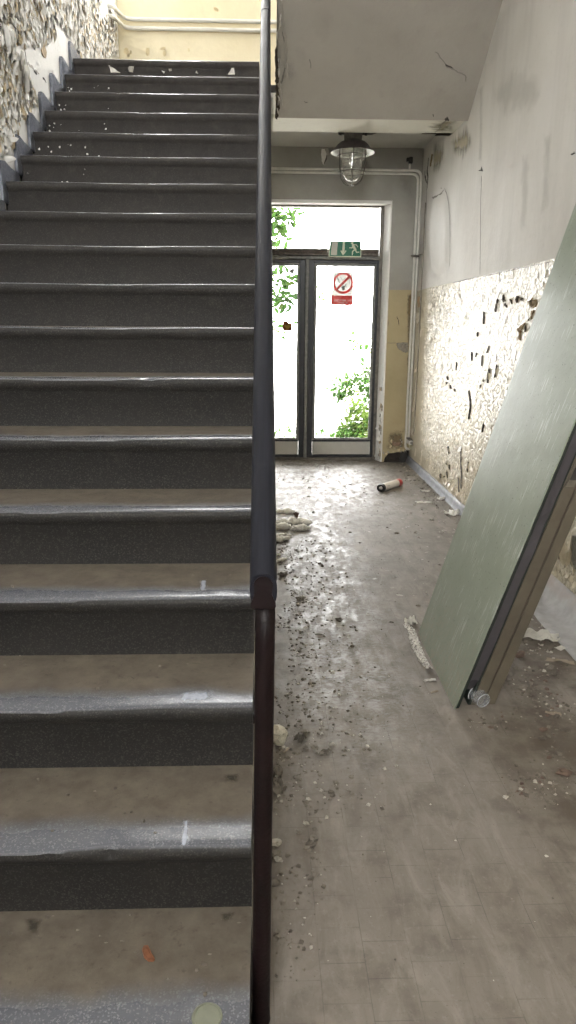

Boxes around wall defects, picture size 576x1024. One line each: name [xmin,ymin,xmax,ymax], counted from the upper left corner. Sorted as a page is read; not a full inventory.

peeling [0,0,134,159]
peeling [302,260,555,534]